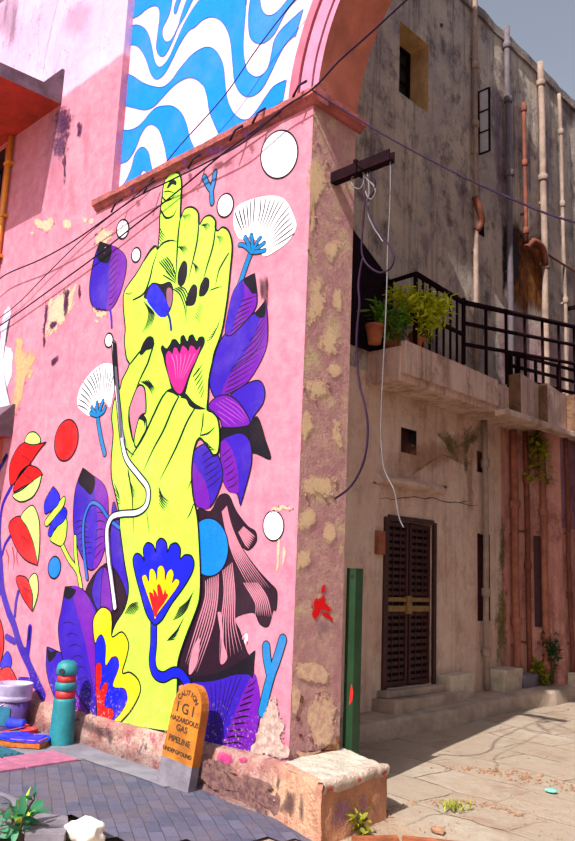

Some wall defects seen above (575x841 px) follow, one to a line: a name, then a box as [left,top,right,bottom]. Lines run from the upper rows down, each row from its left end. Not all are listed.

mould [52,107,82,185]
peeling [306,141,329,231]
peeling [31,217,72,234]
peeling [42,282,81,341]
peeling [307,276,342,326]
corrosion [514,226,542,313]
peeling [12,337,37,415]
peeling [303,326,342,402]
peeling [300,410,313,441]
peeling [270,504,336,544]
peeling [302,474,337,498]
peeling [250,661,337,760]